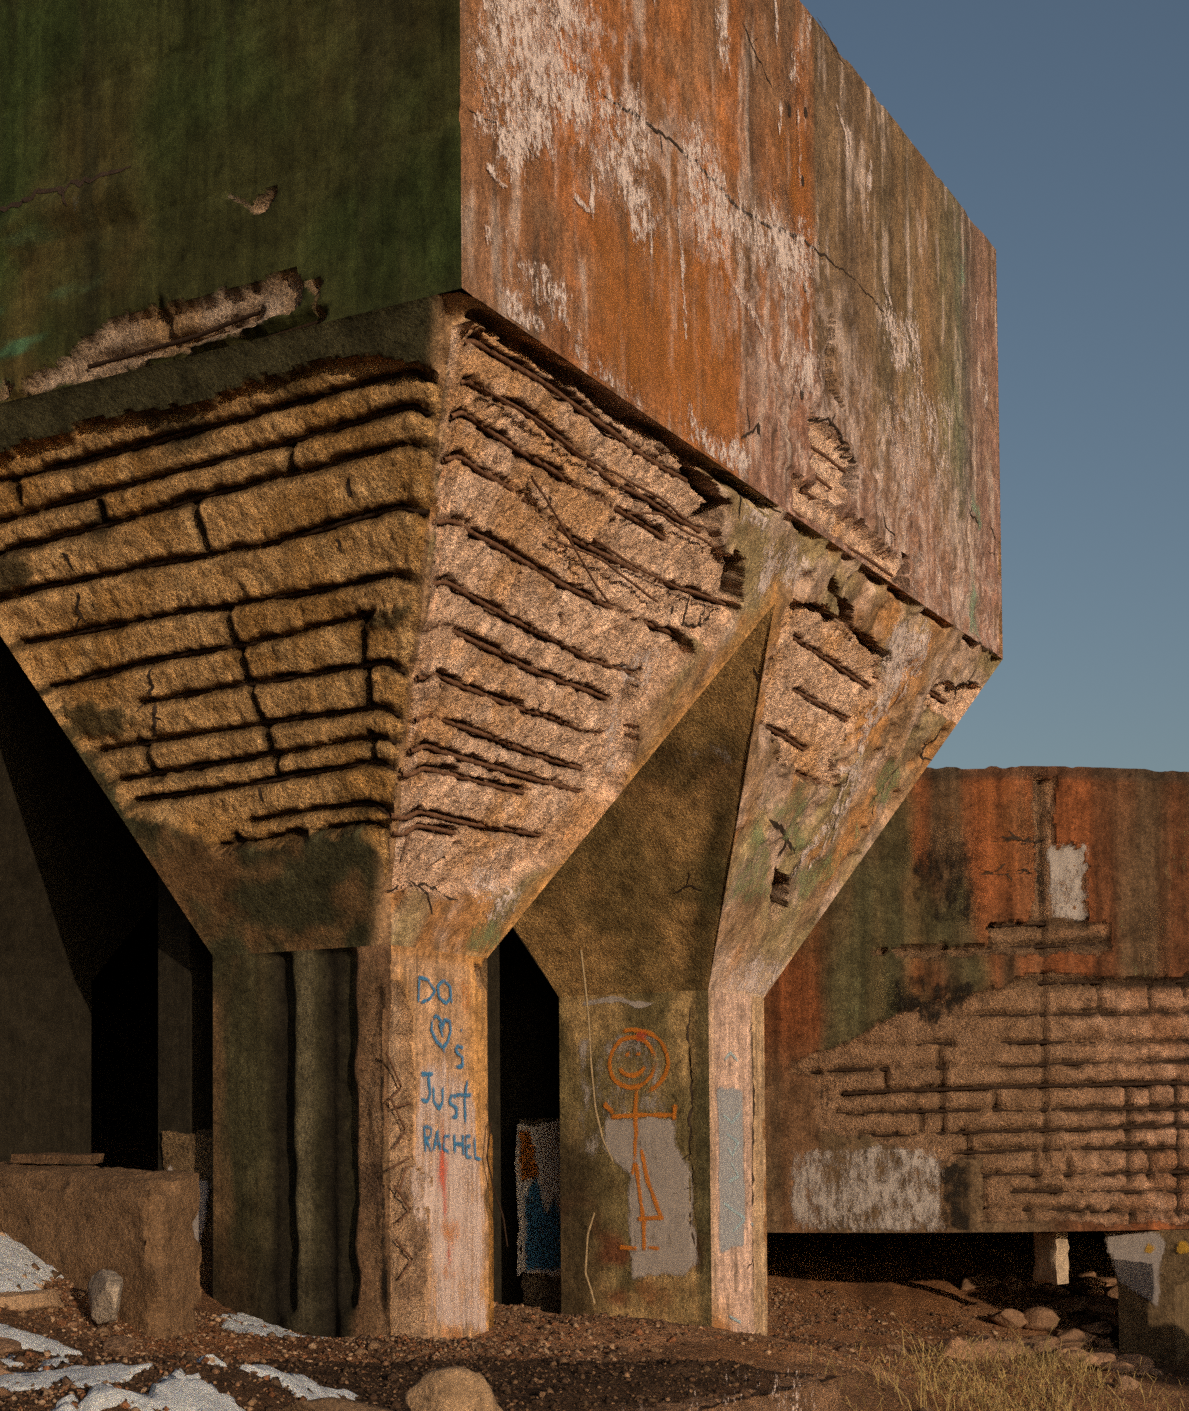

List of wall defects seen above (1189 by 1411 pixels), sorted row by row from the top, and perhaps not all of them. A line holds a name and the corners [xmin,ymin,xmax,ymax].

efflorescence [469,0,658,259]
leakage [502,260,640,406]
efflorescence [715,0,731,75]
efflorescence [678,114,822,401]
crack [604,95,900,340]
efflorescence [774,0,811,81]
spalling [824,313,846,412]
spalling [791,407,911,598]
spalling [0,318,747,903]
spalling [768,866,790,923]
spalling [788,775,1189,1228]